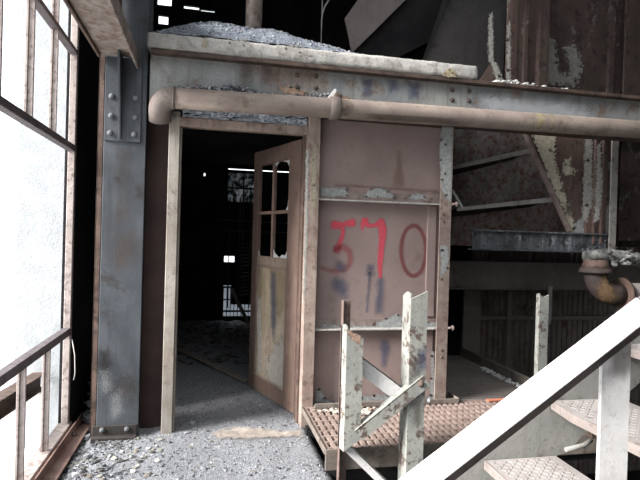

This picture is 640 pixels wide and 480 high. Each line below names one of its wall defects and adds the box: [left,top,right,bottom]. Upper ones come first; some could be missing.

peeling [487,11,512,83]
peeling [548,37,584,90]
peeling [439,126,454,202]
peeling [531,135,609,233]
peeling [440,244,449,277]
rust [596,274,617,304]
peeling [257,297,284,388]